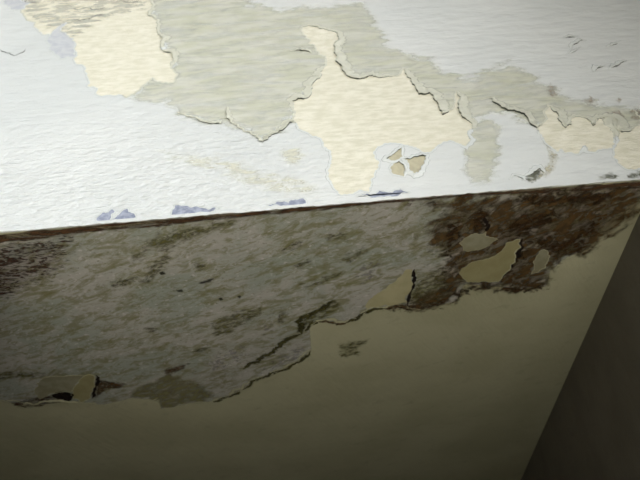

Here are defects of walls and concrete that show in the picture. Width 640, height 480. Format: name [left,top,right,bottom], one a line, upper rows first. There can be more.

peeling [3,0,180,98]
peeling [177,23,477,198]
peeling [480,96,640,171]
water stain [133,221,233,277]
water stain [214,310,255,335]
peeling [0,186,640,409]
water stain [403,185,640,311]
water stain [132,374,210,407]